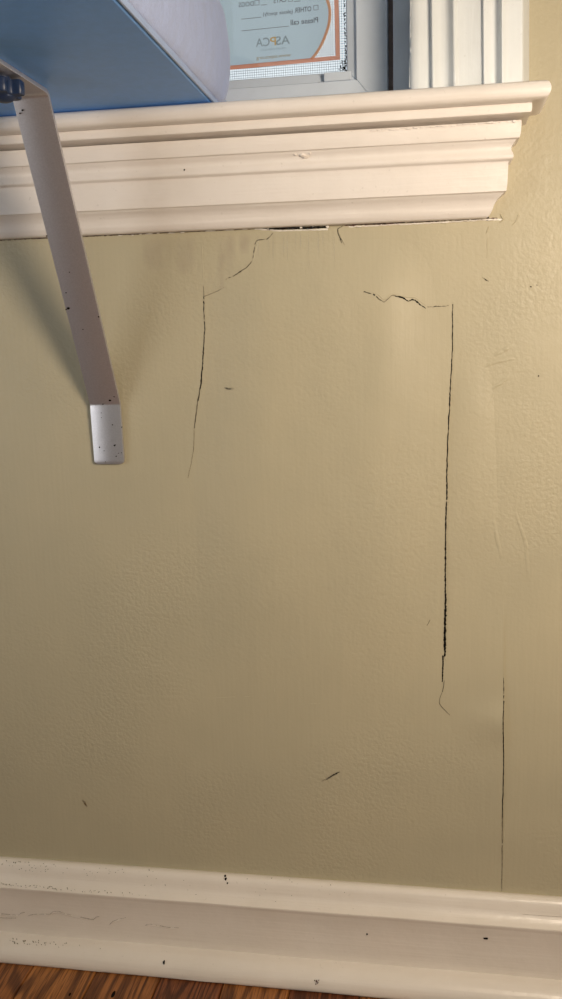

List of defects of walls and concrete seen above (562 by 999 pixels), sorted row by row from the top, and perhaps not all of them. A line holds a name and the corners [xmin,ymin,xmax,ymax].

crack [187,233,273,478]
crack [364,290,453,711]
crack [499,679,507,891]